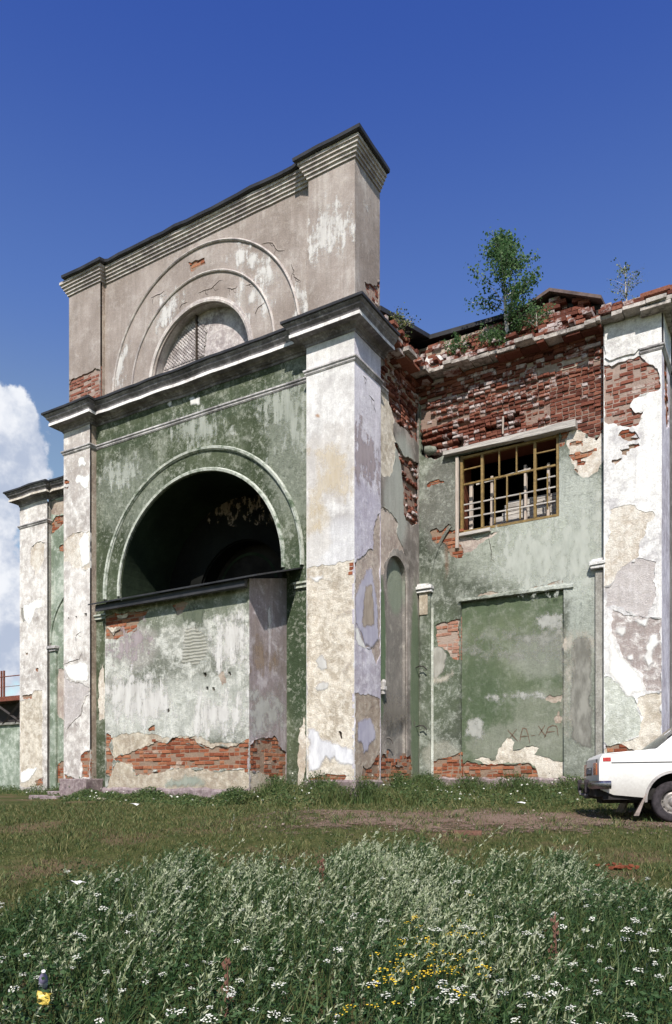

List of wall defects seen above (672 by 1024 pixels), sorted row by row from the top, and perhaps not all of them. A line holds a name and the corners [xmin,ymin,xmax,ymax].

flaking render [189,258,205,272]
crack [262,241,302,282]
crack [151,278,268,314]
spalling [57,340,668,794]